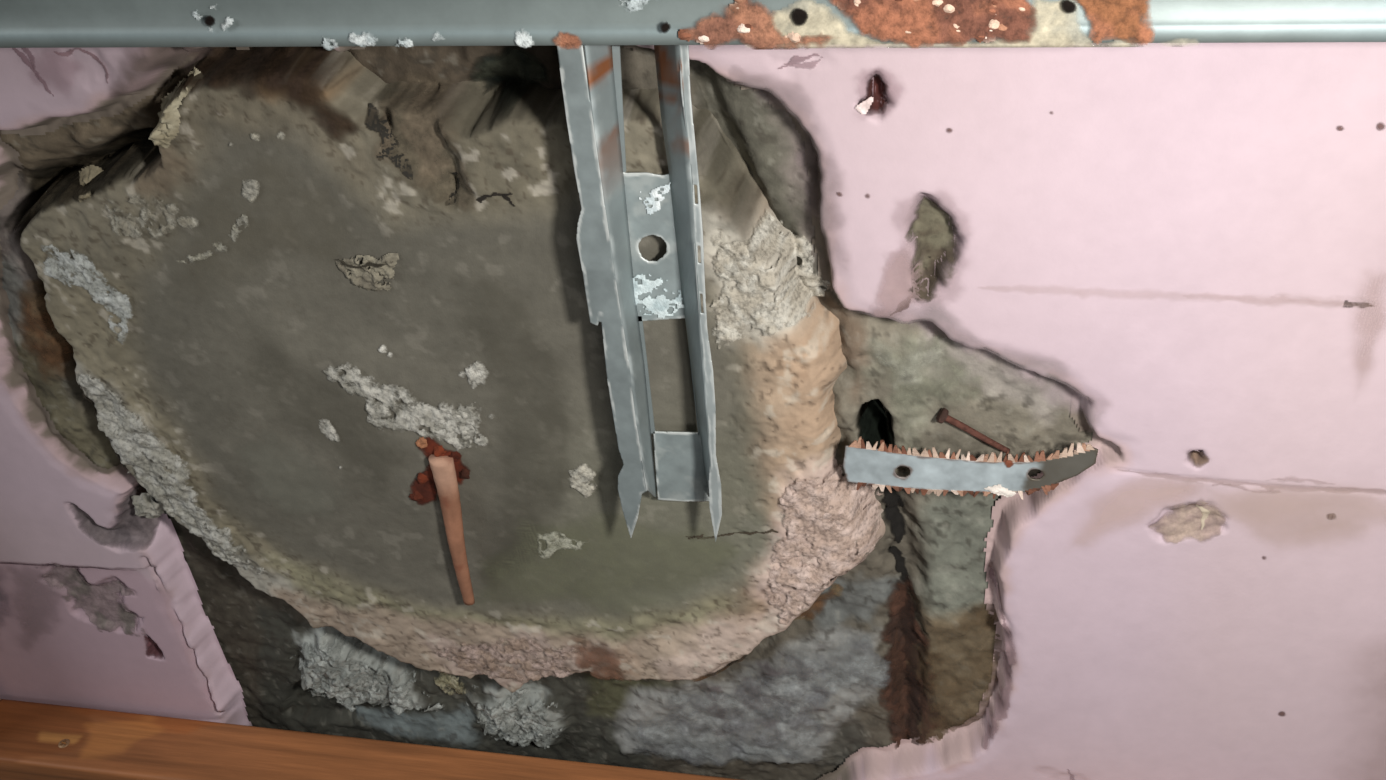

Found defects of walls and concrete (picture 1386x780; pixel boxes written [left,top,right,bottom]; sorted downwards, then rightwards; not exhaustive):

rust [678,0,830,50]
rust [832,0,1036,48]
rust [1077,0,1155,44]
peeling [855,97,873,114]
spalling [376,77,474,208]
peeling [335,253,399,292]
spalling [880,197,957,319]
rust [409,437,470,505]
rust [880,580,949,748]